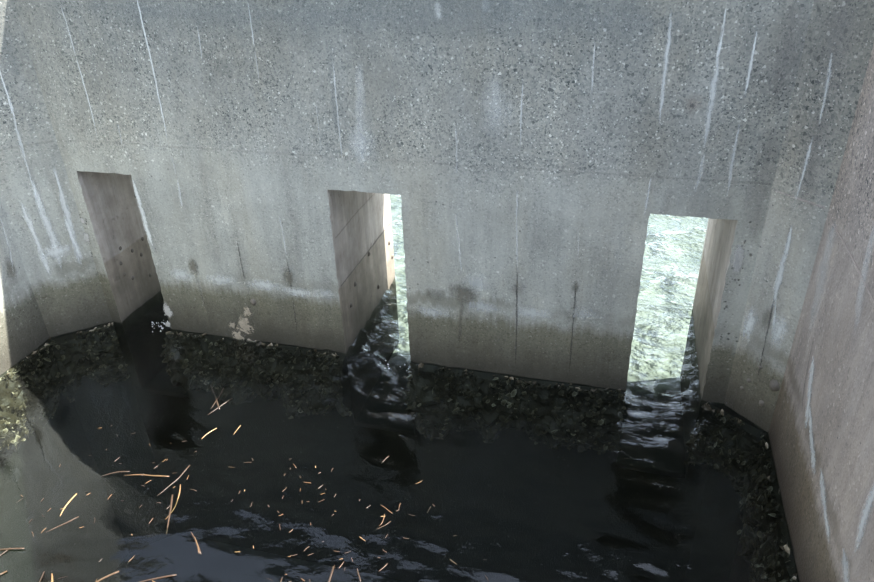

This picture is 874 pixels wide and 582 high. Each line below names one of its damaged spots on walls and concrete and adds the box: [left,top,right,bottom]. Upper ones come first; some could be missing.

water stain [22,173,81,273]
crack [512,273,520,363]
crack [570,284,578,362]